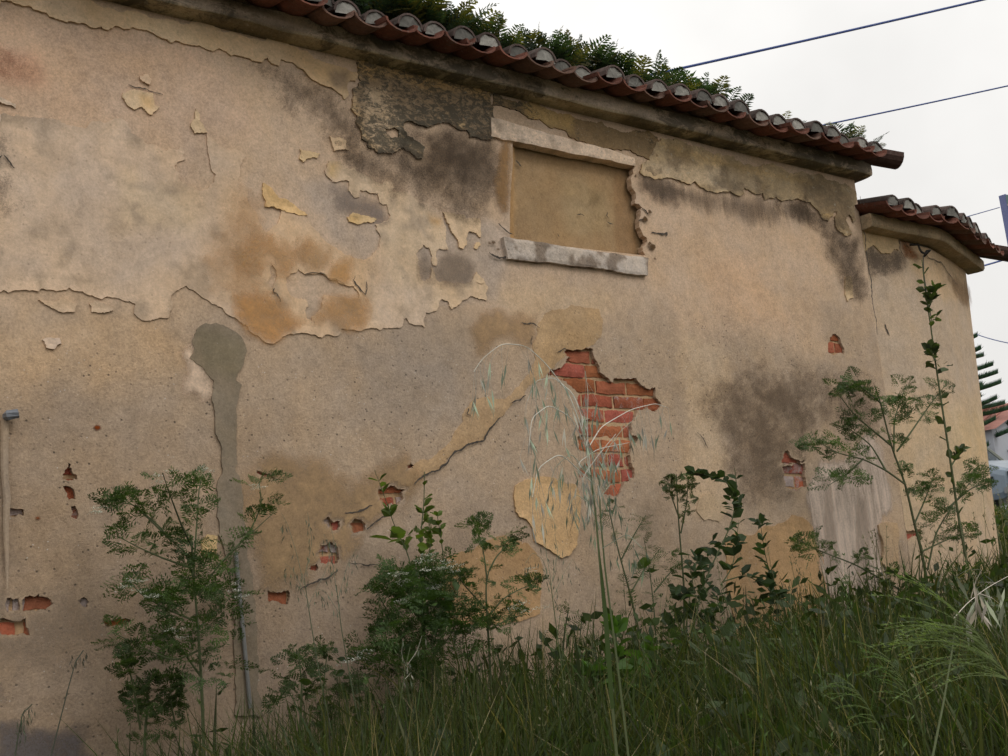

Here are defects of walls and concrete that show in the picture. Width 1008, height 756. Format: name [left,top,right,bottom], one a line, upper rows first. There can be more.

peeling [0,0,900,254]
peeling [0,97,499,344]
flaking render [828,334,842,355]
crack [414,395,526,484]
flaking render [547,349,659,496]
damp [712,366,872,499]
flaking render [63,464,78,519]
flaking render [378,486,402,506]
flaking render [781,452,804,490]
flaking render [350,520,363,533]
flaking render [310,543,337,571]
flaking render [0,595,52,635]